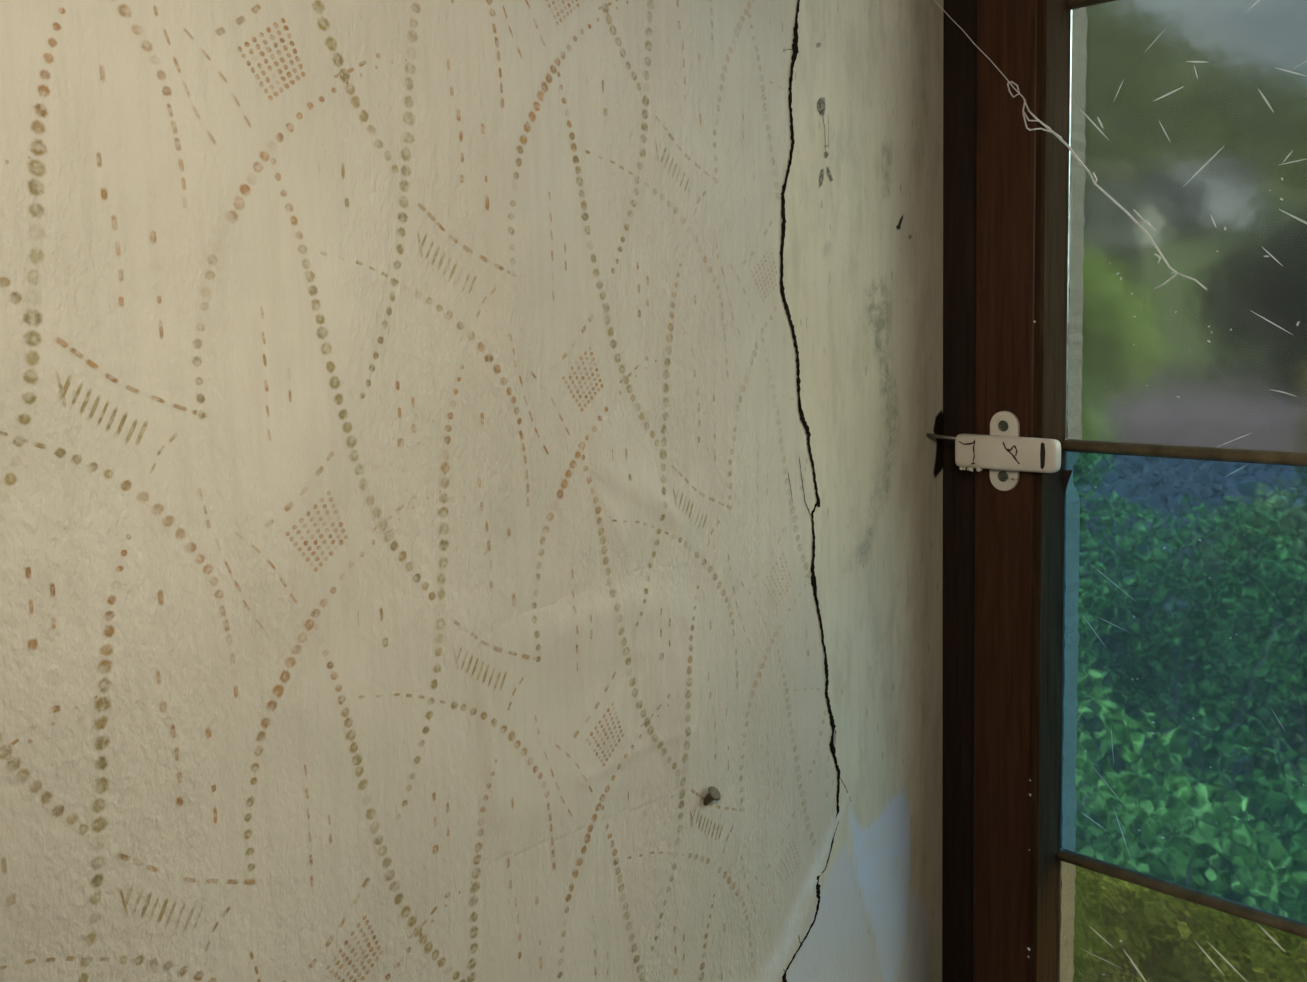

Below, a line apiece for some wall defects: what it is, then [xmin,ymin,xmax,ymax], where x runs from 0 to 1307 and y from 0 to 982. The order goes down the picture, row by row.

crack [780,0,851,982]